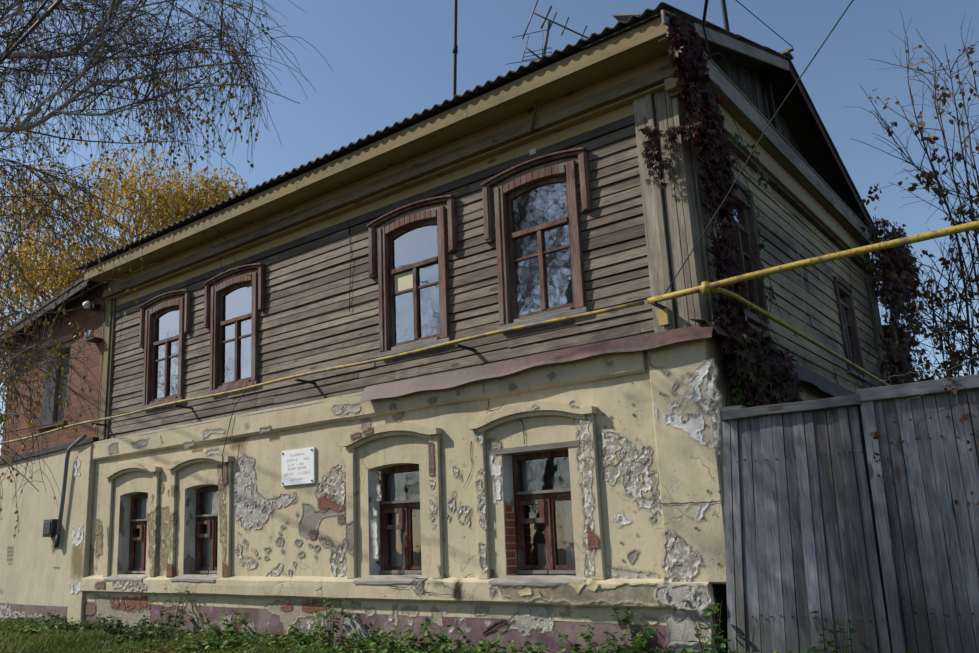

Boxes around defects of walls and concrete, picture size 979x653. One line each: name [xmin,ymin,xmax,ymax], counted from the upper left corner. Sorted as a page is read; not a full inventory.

peeling [654,361,720,455]
peeling [69,480,195,627]
peeling [206,448,354,577]
peeling [369,485,381,565]
flaking render [428,442,517,573]
peeling [475,400,728,653]
peeling [185,601,256,637]
peeling [264,599,375,646]
peeling [430,608,469,632]